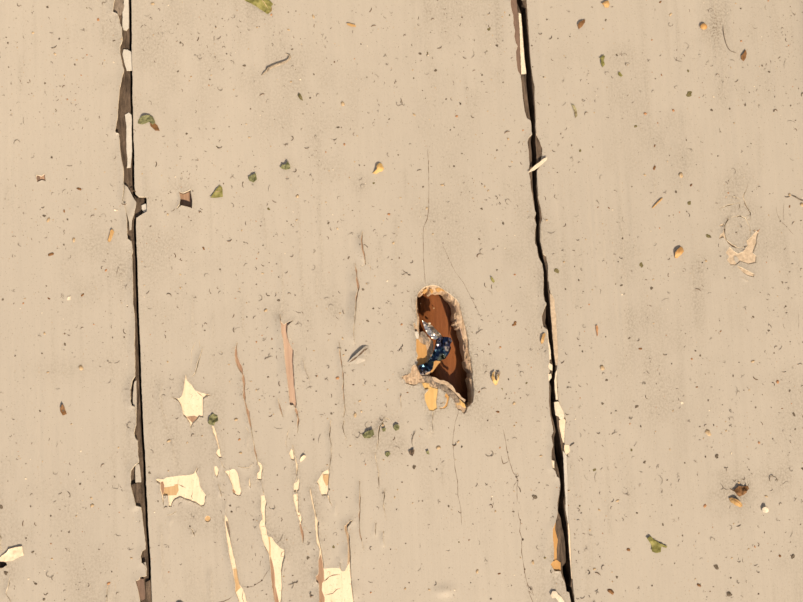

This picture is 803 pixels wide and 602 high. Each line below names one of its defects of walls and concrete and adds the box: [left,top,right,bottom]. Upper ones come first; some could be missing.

peeling [113,0,124,15]
peeling [174,379,210,426]
peeling [280,319,297,407]
spalling [402,285,474,414]
peeling [157,468,206,507]
peeling [212,426,263,496]
peeling [290,449,306,524]
peeling [225,516,247,602]
peeling [260,495,285,602]
peeling [310,466,354,602]